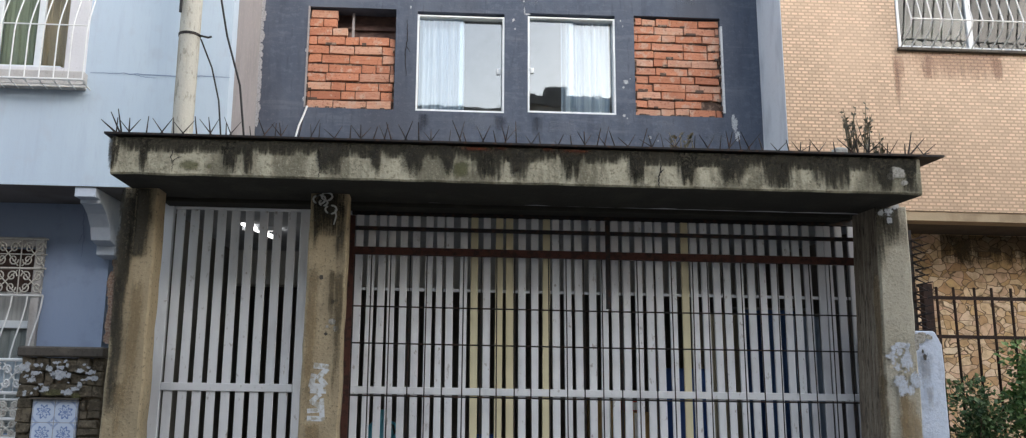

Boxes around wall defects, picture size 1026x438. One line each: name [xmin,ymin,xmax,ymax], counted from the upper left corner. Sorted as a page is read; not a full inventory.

water stain [108,136,917,191]
peeling [19,360,98,396]
peeling [886,332,933,397]